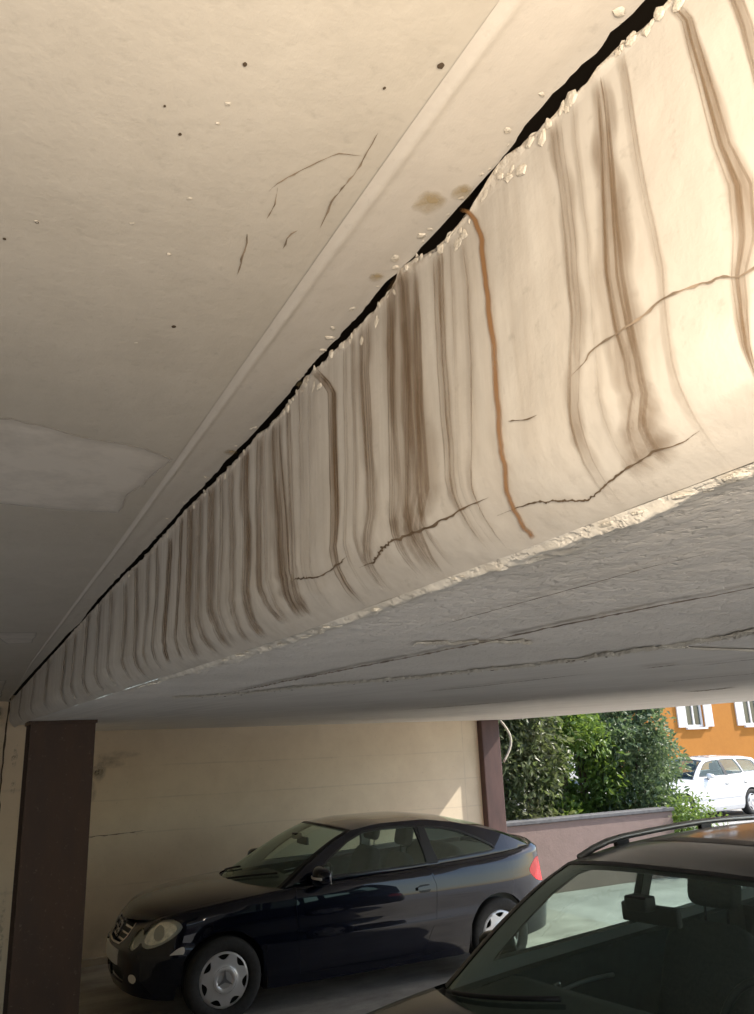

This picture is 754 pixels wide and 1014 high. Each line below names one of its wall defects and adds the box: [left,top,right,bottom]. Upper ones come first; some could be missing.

damp [679,11,717,136]
damp [602,128,622,280]
damp [728,162,741,200]
damp [323,379,337,523]
crack [0,0,754,808]
rust [465,210,533,537]